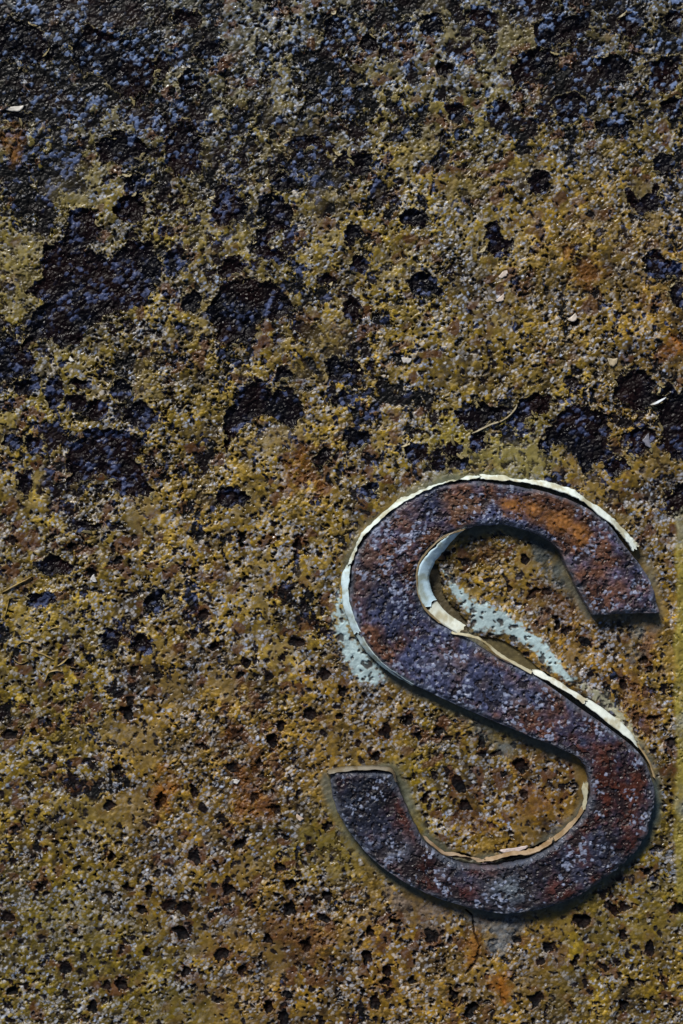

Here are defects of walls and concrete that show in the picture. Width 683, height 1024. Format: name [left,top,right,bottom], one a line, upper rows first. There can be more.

rust [359,481,380,499]
rust [501,498,589,545]